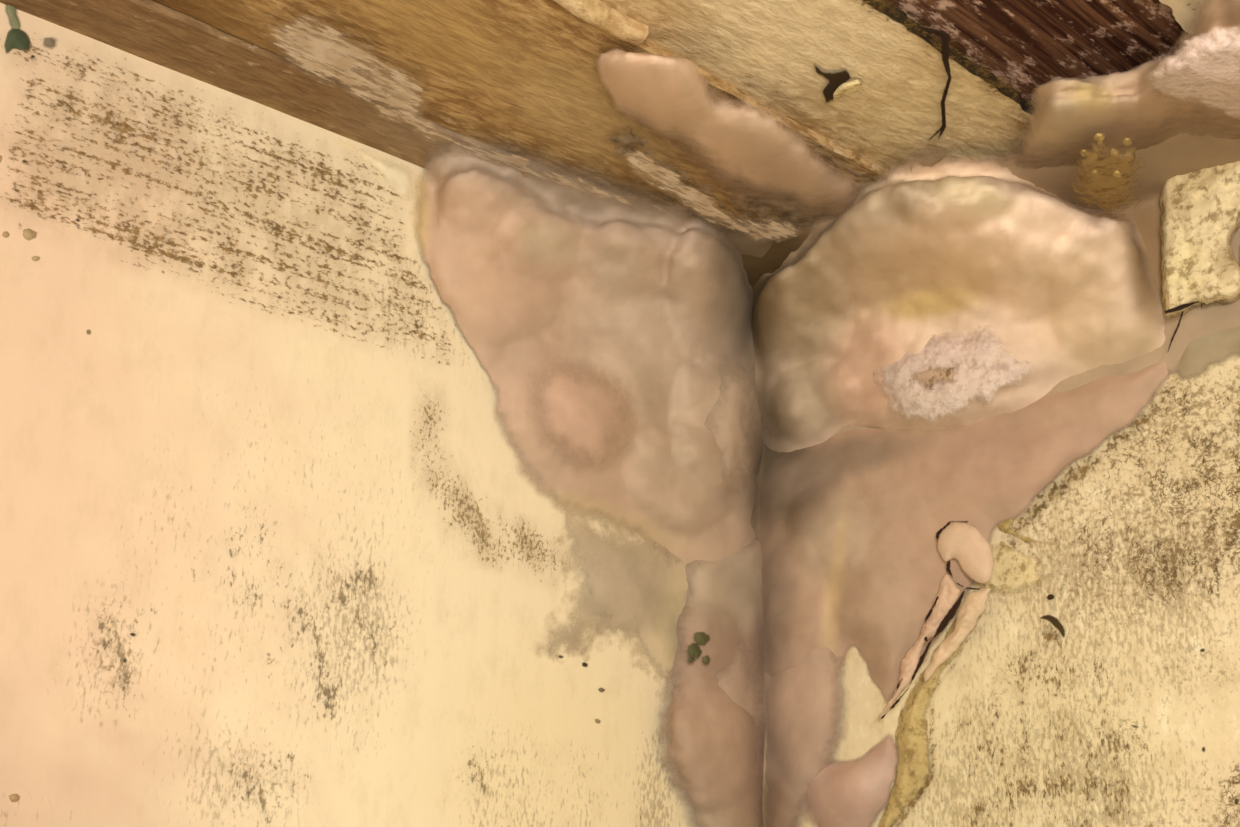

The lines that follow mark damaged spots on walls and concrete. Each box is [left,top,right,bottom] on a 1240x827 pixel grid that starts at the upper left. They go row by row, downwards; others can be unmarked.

leakage [0,5,451,365]
crack [917,27,951,140]
leakage [1010,379,1240,609]
spalling [878,518,1054,827]
leakage [952,620,1152,827]
spalling [1041,615,1065,641]
leakage [1221,765,1240,827]